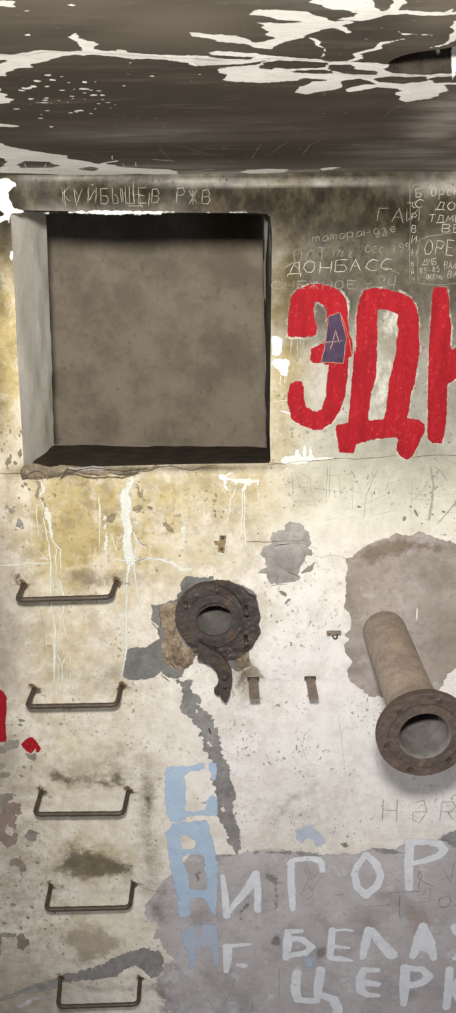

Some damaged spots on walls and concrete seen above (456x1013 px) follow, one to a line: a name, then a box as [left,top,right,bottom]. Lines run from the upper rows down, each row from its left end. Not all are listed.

spalling [388,47,456,76]
water stain [0,482,78,699]
water stain [98,476,192,680]
water stain [215,472,262,569]
peeling [0,719,40,887]
peeling [0,897,47,955]